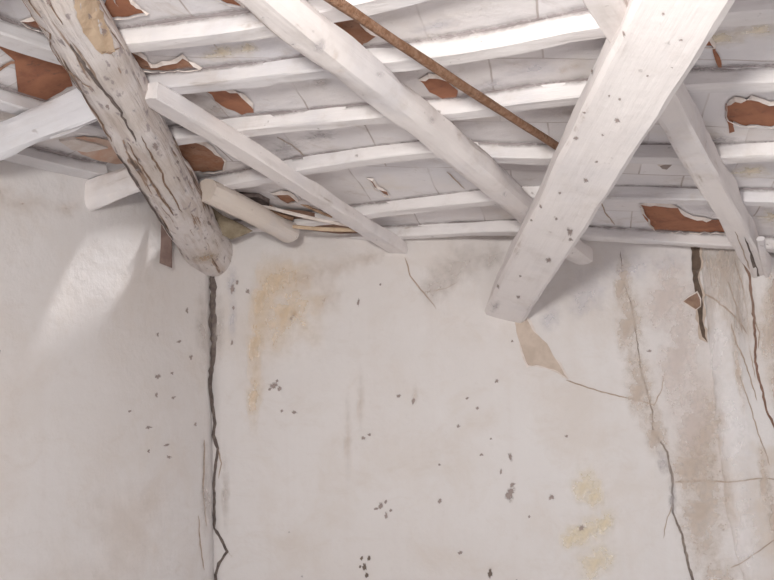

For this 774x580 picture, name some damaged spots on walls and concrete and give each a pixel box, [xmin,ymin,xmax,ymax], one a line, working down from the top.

peeling [105,0,149,20]
peeling [334,20,377,45]
peeling [0,46,73,102]
peeling [208,90,254,115]
peeling [419,74,458,99]
peeling [725,95,774,133]
peeling [59,136,123,164]
peeling [178,142,227,174]
peeling [639,203,726,235]
flaking render [515,317,569,380]
crack [198,276,229,580]
crack [566,251,774,580]